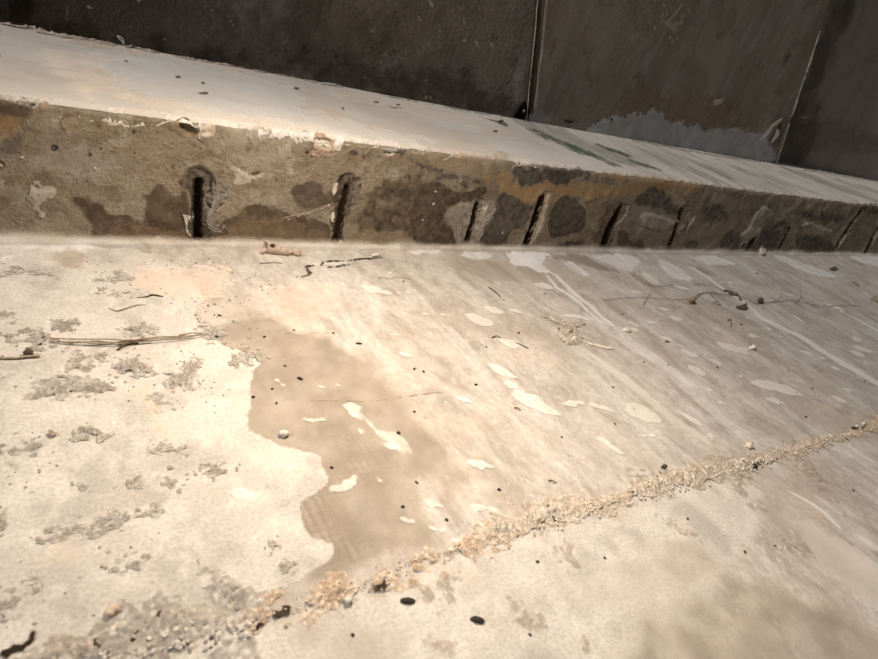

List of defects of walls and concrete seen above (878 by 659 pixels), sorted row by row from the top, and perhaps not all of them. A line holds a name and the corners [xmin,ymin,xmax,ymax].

spalling [0,94,296,141]
spalling [179,169,233,241]
spalling [305,132,878,254]
leakage [223,316,465,577]
crack [372,579,387,591]
crack [0,631,35,658]
crack [130,610,163,643]
crack [256,605,291,629]